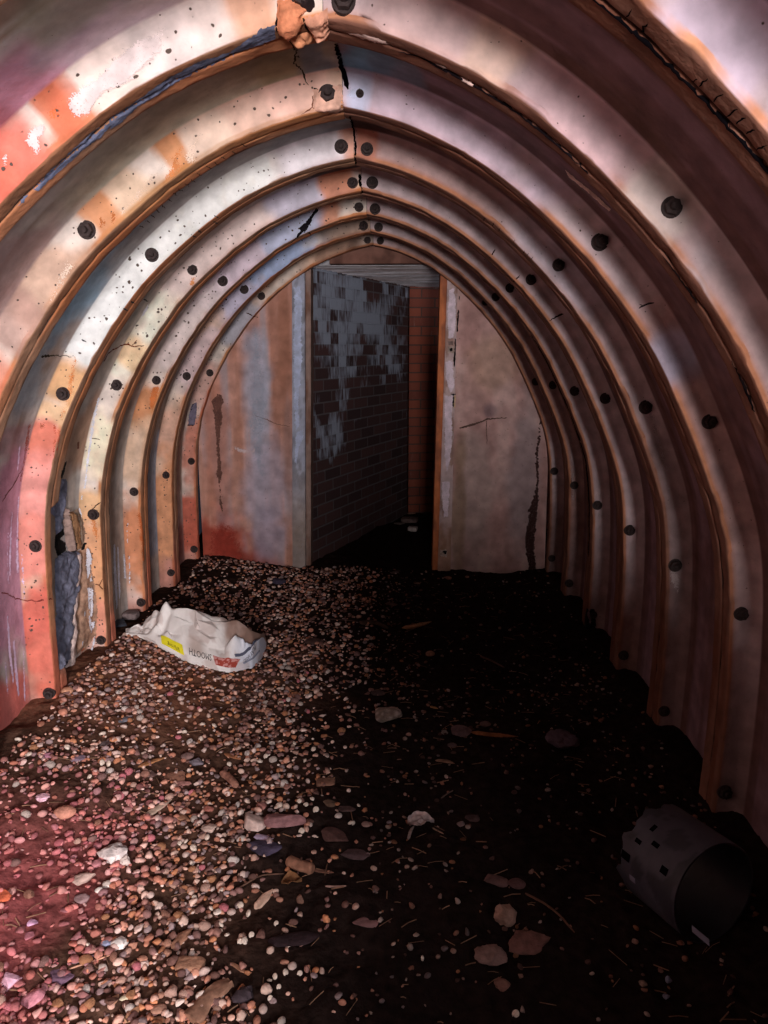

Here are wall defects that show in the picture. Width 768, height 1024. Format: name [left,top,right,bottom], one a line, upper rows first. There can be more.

crack [334,44,349,92]
spalling [18,0,330,206]
crack [291,207,319,243]
crack [459,417,507,441]
crack [531,313,590,556]
corrosion [206,522,243,560]
spalling [51,461,87,670]